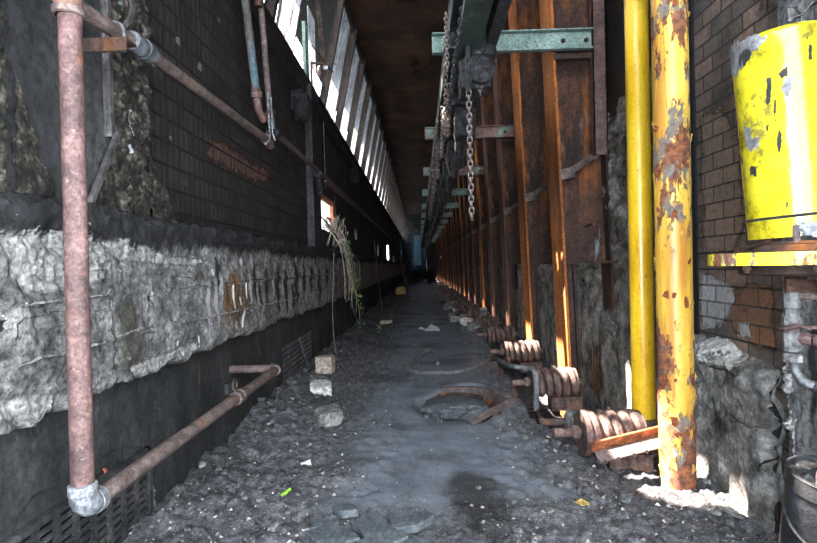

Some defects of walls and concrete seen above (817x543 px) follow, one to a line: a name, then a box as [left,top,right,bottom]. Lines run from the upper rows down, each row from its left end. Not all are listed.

peeling [730,33,768,82]
peeling [782,76,792,97]
spalling [0,225,64,293]
spalling [88,236,209,283]
crack [16,295,61,352]
crack [91,289,116,370]
corrosion [222,269,255,327]
spalling [129,342,205,377]
spalling [0,387,64,426]
crack [697,361,783,474]